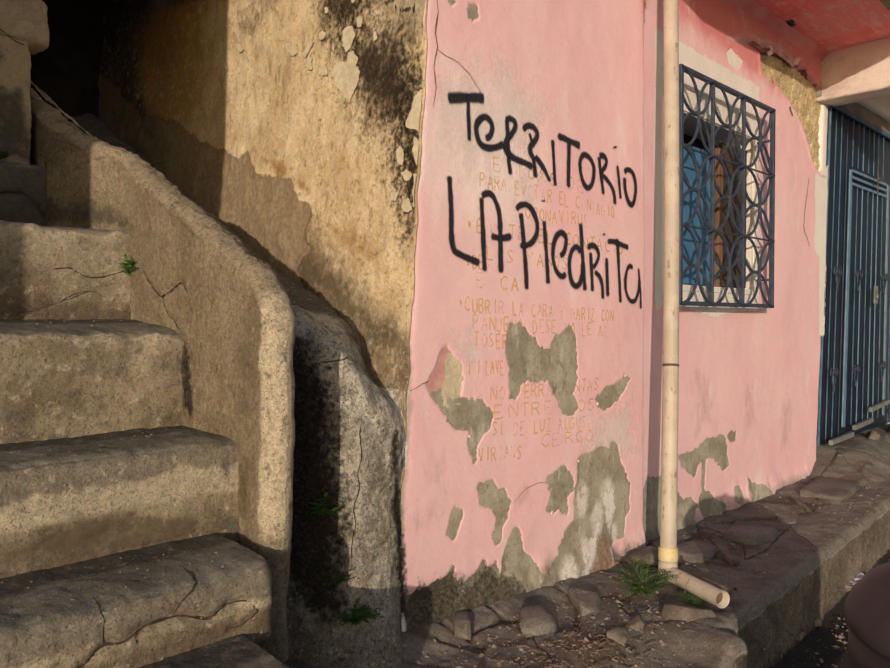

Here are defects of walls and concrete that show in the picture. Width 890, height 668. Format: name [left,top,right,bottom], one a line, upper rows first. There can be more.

flaking render [285,16,362,102]
crack [433,2,481,107]
water stain [393,67,421,246]
crack [18,267,191,330]
water stain [181,343,192,419]
peeling [505,322,579,416]
crack [351,418,362,563]
peeling [401,441,631,632]
peeling [643,476,661,541]
peeling [677,430,773,530]
crack [706,527,819,559]
crack [78,568,258,668]